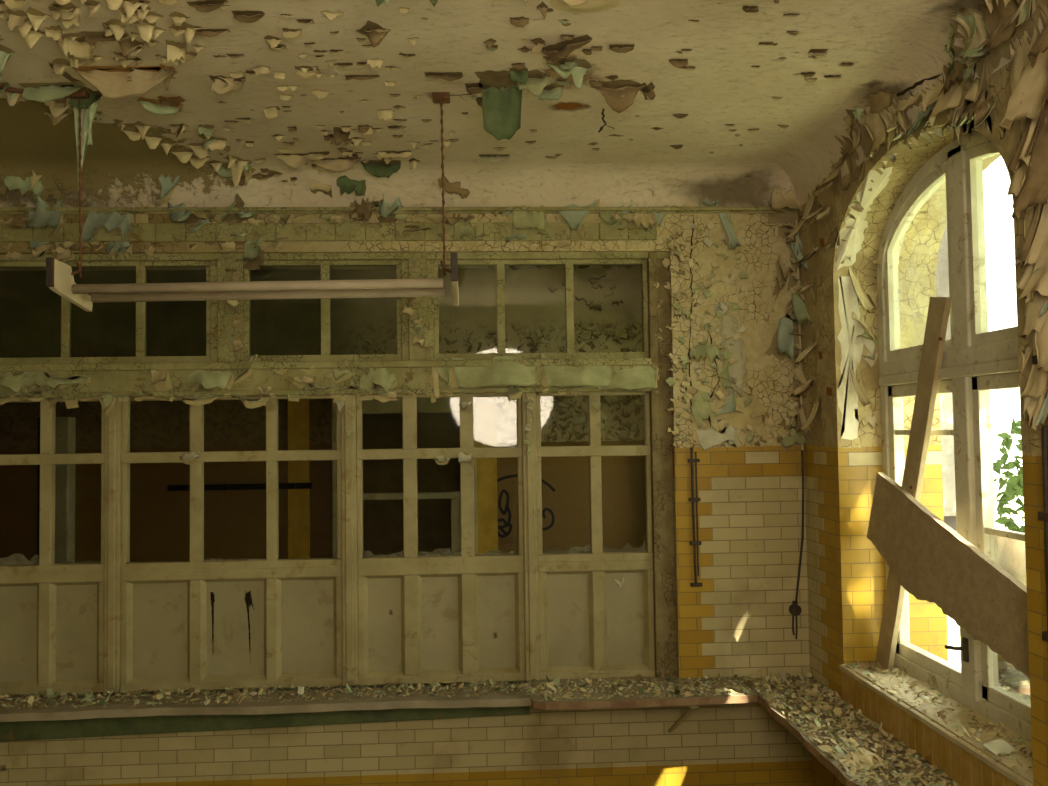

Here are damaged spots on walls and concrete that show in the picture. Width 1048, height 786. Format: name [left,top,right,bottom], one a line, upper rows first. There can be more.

peeling [0,0,1048,457]
crack [688,218,741,426]
peeling [435,452,473,465]